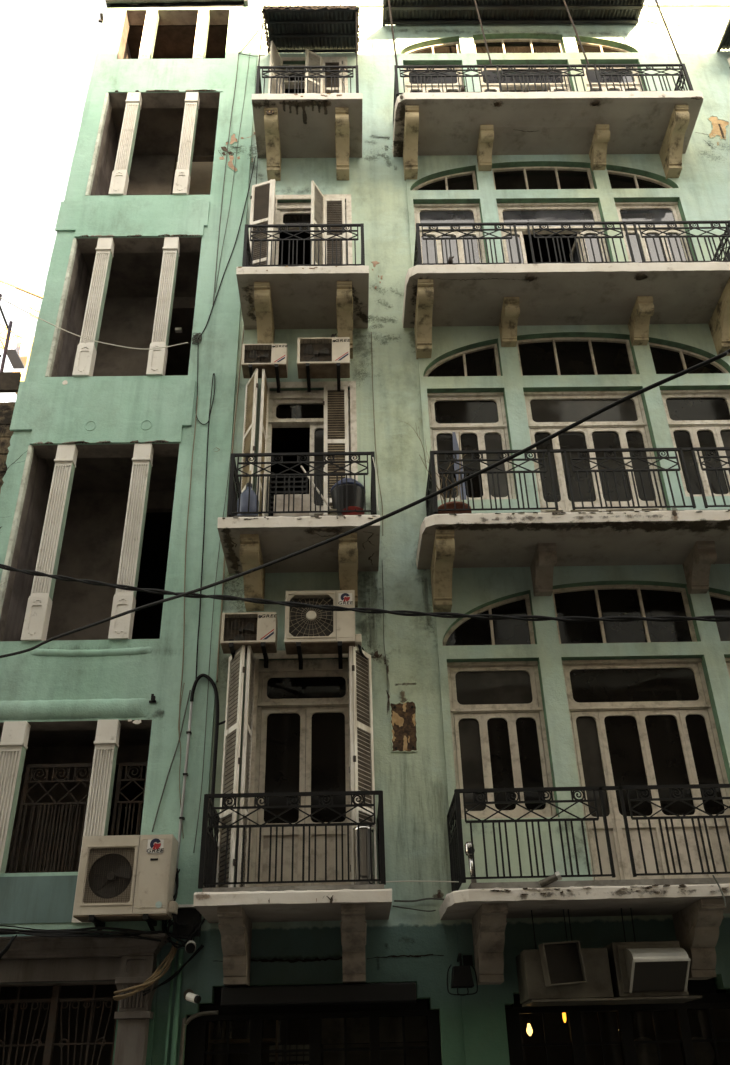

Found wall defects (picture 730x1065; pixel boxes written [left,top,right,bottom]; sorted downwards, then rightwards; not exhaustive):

damp [252,100,331,124]
peeling [695,115,730,147]
peeling [219,132,255,172]
peeling [390,692,418,753]